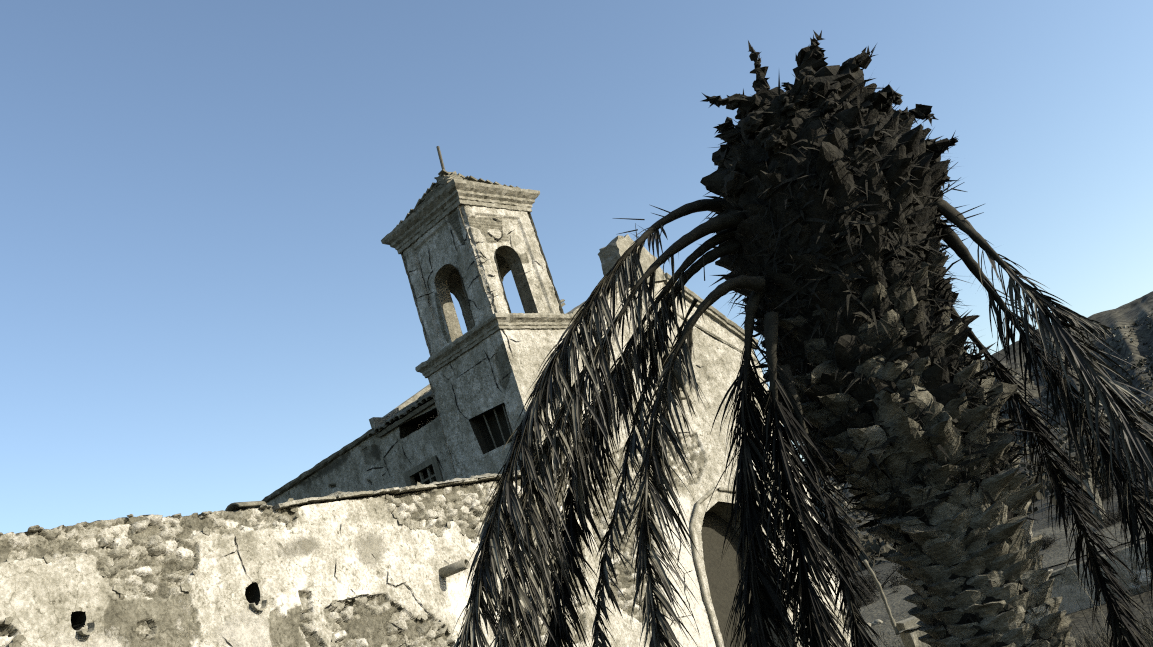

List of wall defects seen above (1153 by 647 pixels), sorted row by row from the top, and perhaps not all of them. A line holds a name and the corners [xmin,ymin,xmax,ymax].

flaking render [0,498,300,647]
flaking render [269,591,456,647]
flaking render [385,431,707,647]
crack [670,505,700,635]